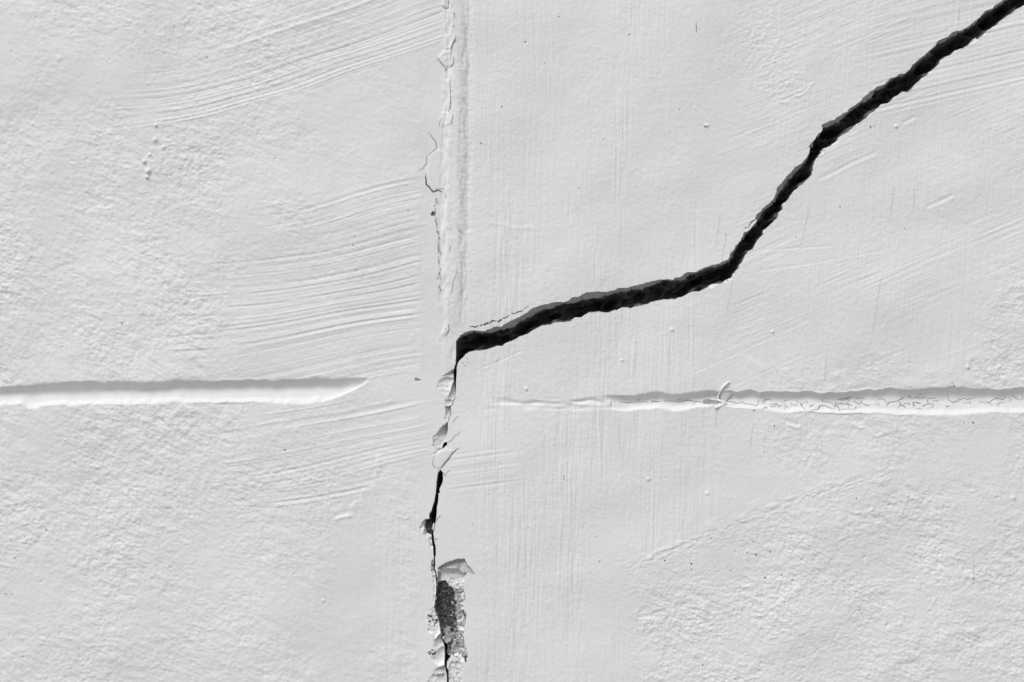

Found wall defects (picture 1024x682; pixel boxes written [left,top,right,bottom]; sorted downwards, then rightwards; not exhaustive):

peeling [432,369,455,469]
crack [420,0,1024,682]
spalling [419,519,474,682]